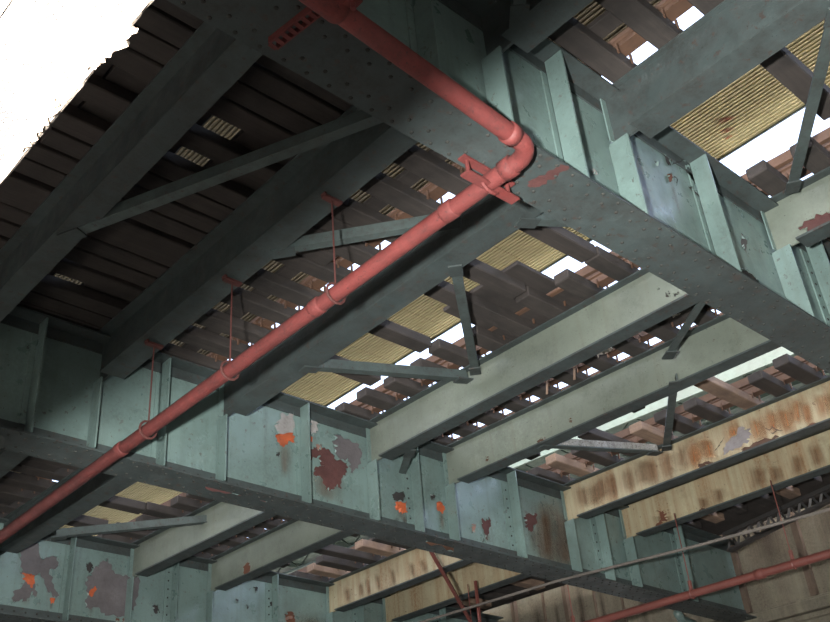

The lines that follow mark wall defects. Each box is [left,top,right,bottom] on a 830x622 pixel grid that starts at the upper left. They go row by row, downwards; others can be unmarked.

peeling [274,413,295,456]
peeling [310,419,363,491]
peeling [392,491,408,514]
peeling [524,513,537,532]
peeling [12,542,59,604]
peeling [85,558,140,622]